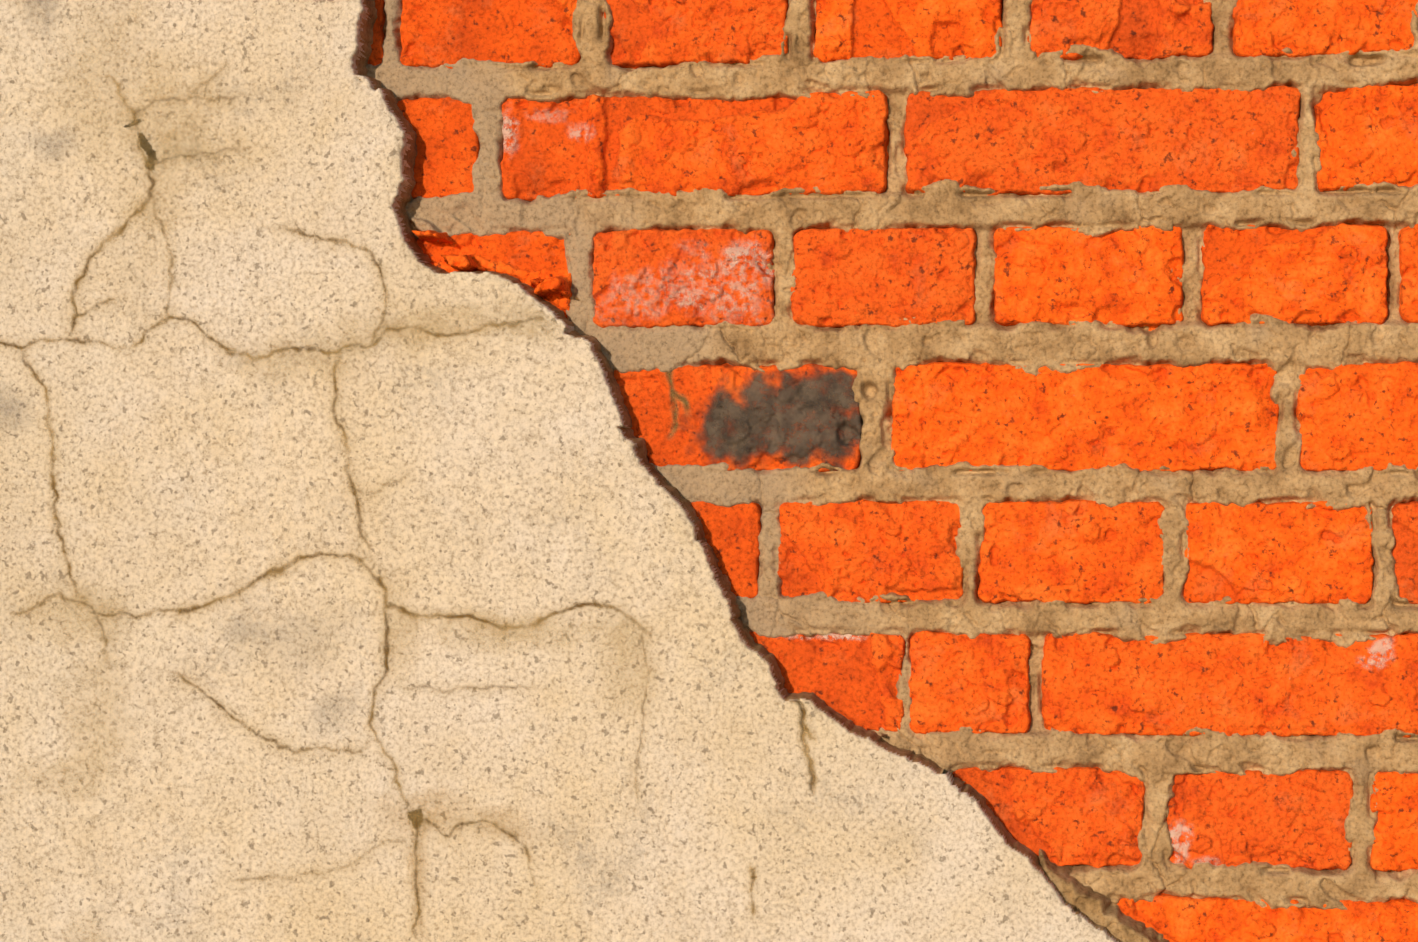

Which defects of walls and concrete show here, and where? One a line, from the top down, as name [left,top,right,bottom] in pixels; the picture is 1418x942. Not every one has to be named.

spalling [587,84,1418,198]
spalling [592,227,977,328]
spalling [993,226,1184,331]
spalling [1201,223,1418,326]
crack [666,372,688,432]
spalling [891,362,1279,472]
crack [0,83,614,928]
spalling [779,499,1165,604]
spalling [870,631,1418,738]
crack [794,701,816,785]
spalling [1169,769,1418,872]
crack [748,868,756,914]